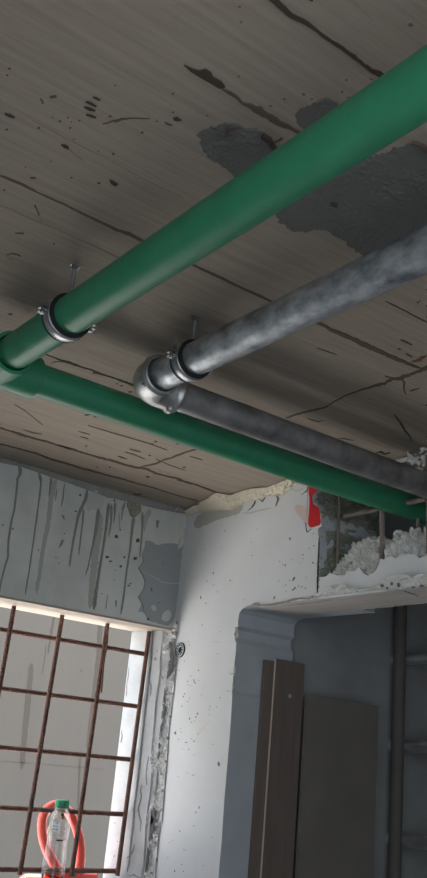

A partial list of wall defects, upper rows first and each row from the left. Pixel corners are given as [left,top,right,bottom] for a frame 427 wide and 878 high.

crack [269,0,384,77]
crack [0,175,144,242]
spalling [196,115,283,178]
crack [222,88,301,134]
spalling [275,143,427,256]
crack [286,322,427,422]
spalling [396,447,427,472]
leakage [0,466,22,591]
leakage [25,472,65,595]
leakage [69,489,183,626]
spalling [245,491,427,608]
flaking render [0,602,198,878]